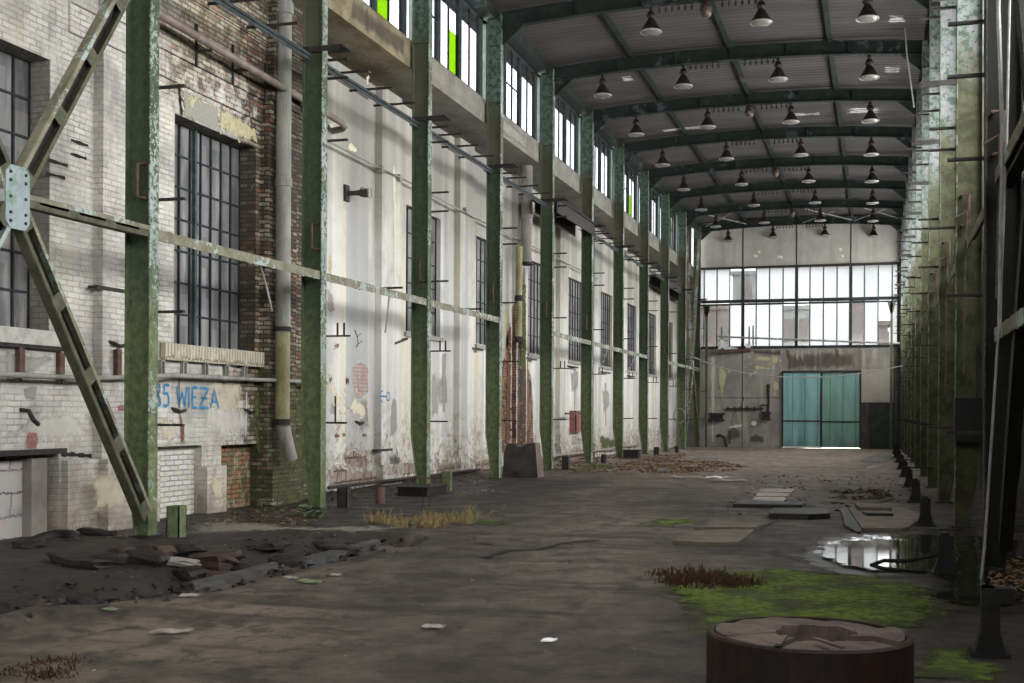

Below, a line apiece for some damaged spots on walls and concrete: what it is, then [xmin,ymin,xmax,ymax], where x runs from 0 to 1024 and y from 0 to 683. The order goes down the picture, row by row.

peeling [183,91,257,146]
spalling [328,360,376,490]
spalling [502,301,534,452]
peeling [749,351,782,396]